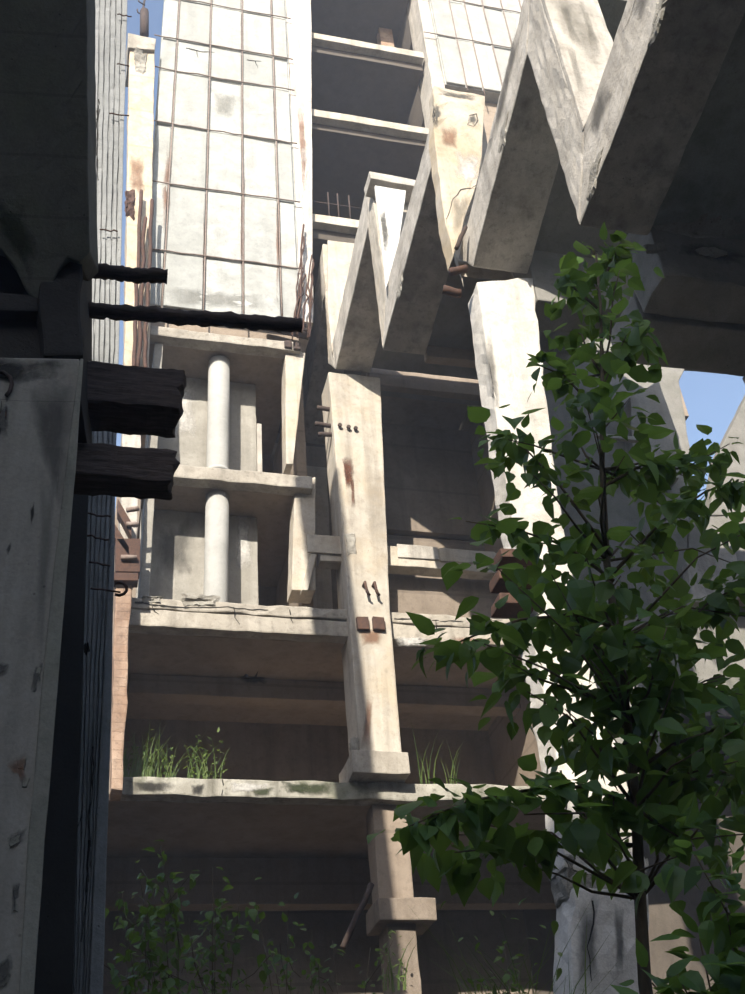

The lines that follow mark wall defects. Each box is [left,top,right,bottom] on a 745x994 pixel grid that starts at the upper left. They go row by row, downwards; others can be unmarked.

corrosion [132,162,142,186]
corrosion [344,461,354,501]
water stain [135,782,166,791]
water stain [582,921,594,967]